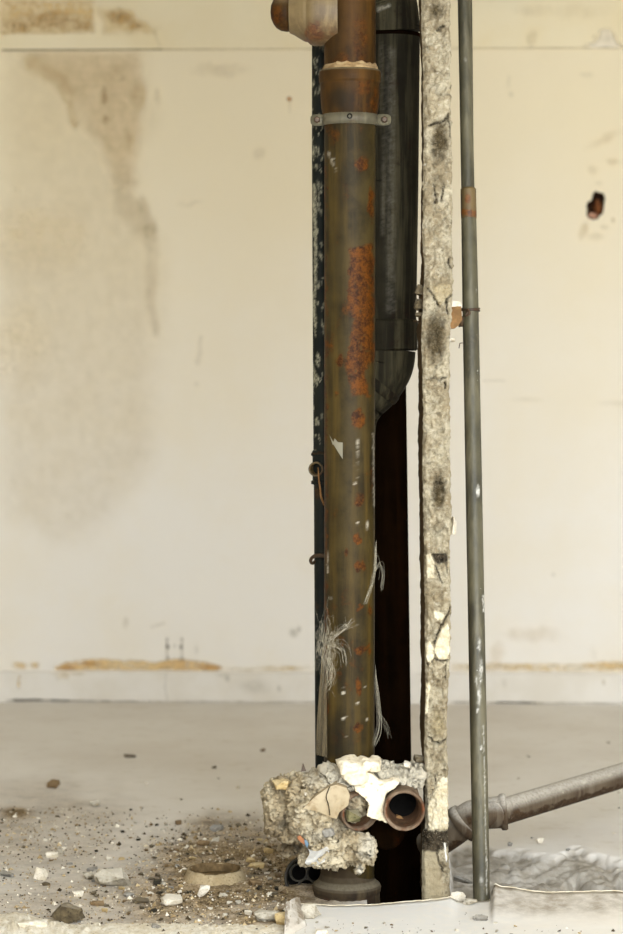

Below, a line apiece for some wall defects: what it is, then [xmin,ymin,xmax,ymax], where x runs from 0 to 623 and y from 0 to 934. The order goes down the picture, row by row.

spalling [586,191,605,220]